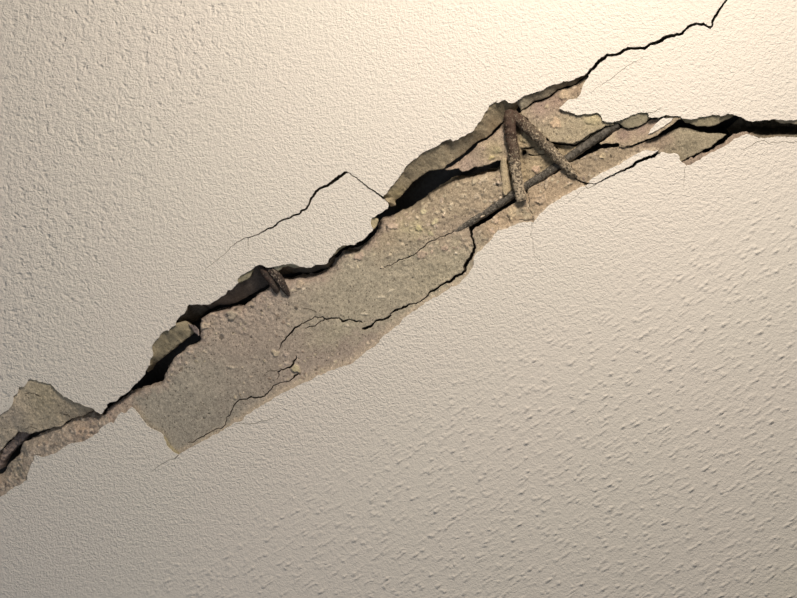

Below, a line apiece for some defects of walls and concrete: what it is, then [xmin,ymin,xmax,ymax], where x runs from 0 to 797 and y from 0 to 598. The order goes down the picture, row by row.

crack [585,0,727,92]
crack [528,120,607,150]
crack [572,150,661,199]
crack [726,117,797,150]
crack [204,171,384,271]
spalling [0,75,753,497]